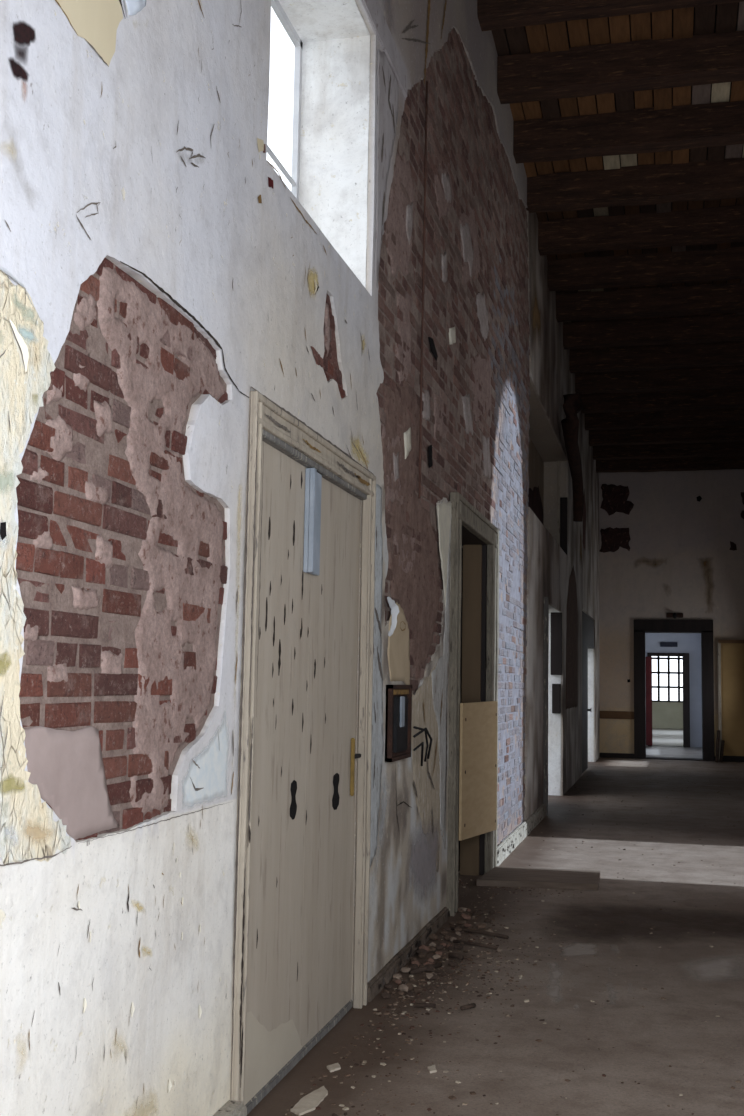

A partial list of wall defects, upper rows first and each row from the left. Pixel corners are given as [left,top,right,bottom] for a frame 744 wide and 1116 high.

peeling [55,0,146,67]
flaking render [304,265,358,413]
flaking render [360,0,543,872]
flaking render [0,258,249,866]
flaking render [599,484,634,553]